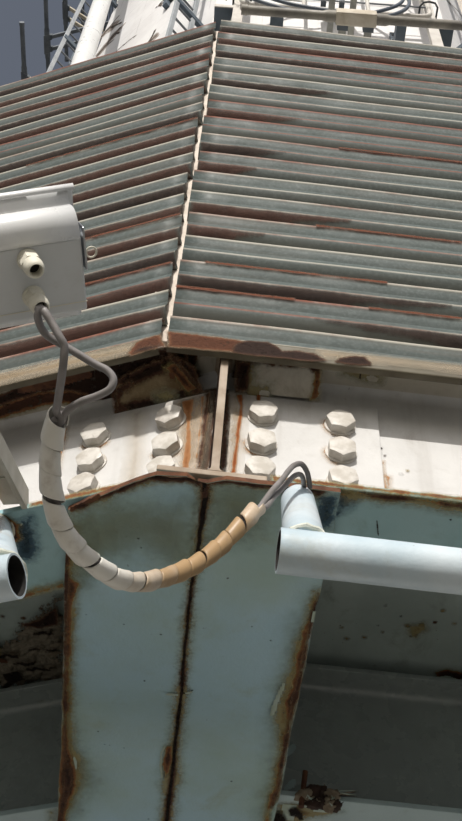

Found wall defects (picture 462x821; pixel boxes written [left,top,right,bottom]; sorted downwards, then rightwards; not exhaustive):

rust [0,27,462,145]
rust [0,108,292,221]
rust [85,202,461,242]
rust [87,229,178,261]
rust [84,251,176,285]
rust [205,261,387,283]
rust [84,274,462,319]
rust [0,331,462,514]
rust [4,515,21,542]
rust [0,553,83,821]
rust [265,591,330,821]